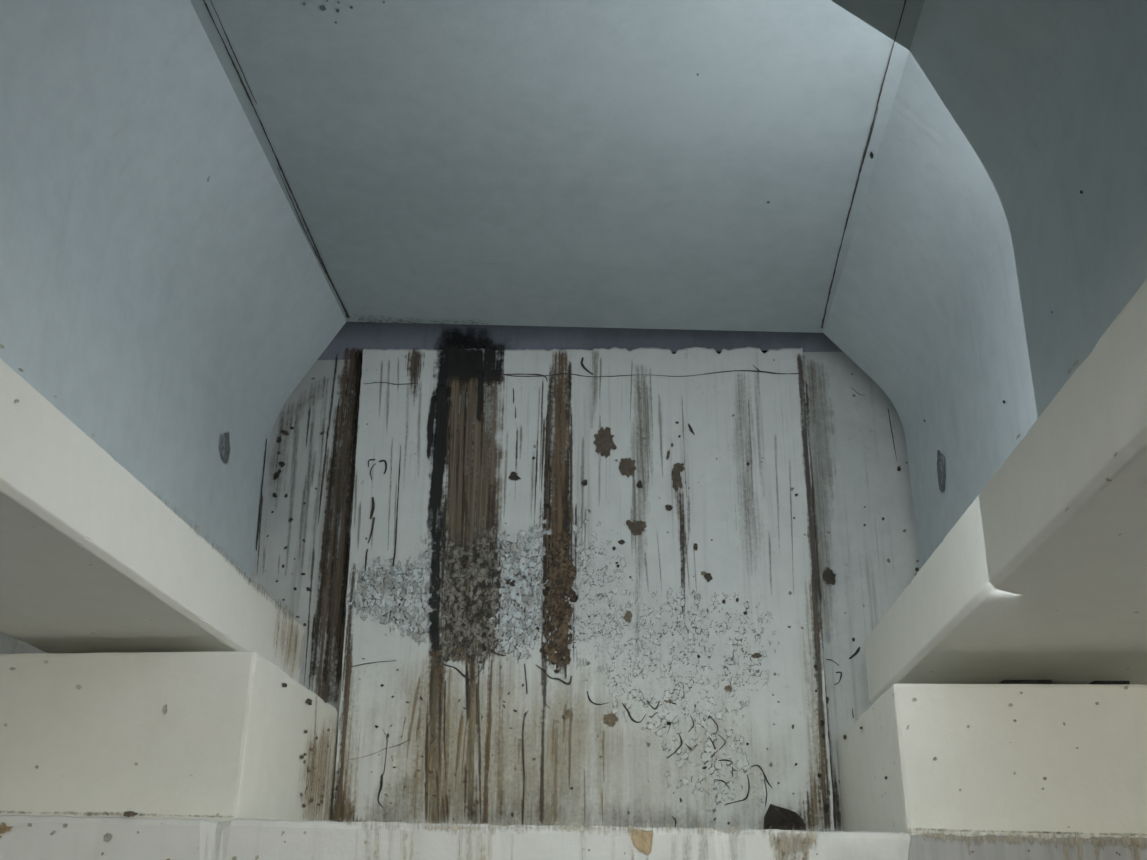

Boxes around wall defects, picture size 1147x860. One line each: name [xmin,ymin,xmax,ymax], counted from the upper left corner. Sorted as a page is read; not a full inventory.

corrosion [277,347,363,702]
corrosion [409,379,503,824]
corrosion [540,351,577,823]
peeling [347,503,775,821]
water stain [797,354,841,829]